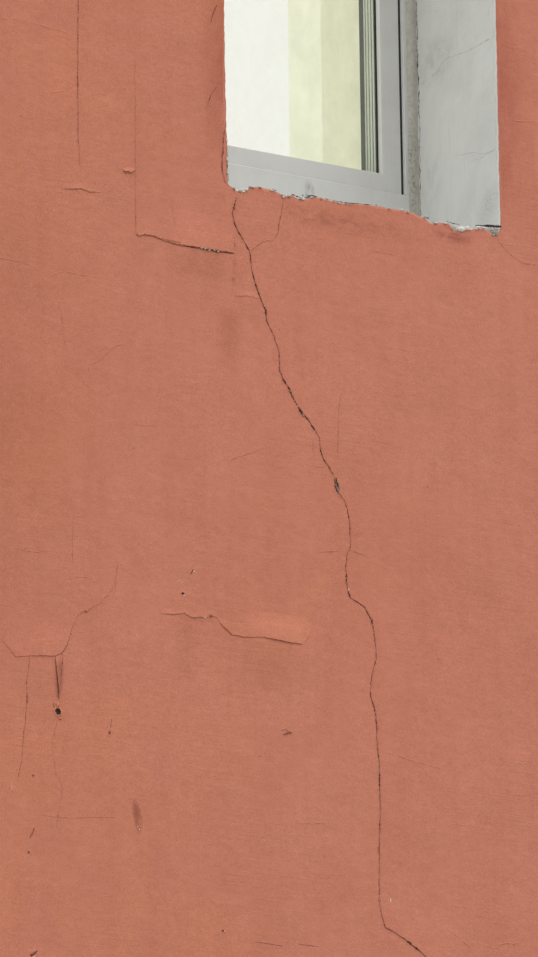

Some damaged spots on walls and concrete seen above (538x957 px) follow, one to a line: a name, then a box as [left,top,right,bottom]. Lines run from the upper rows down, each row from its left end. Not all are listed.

spalling [226,139,410,213]
spalling [424,217,501,236]
crack [220,125,427,957]
crack [17,656,30,780]